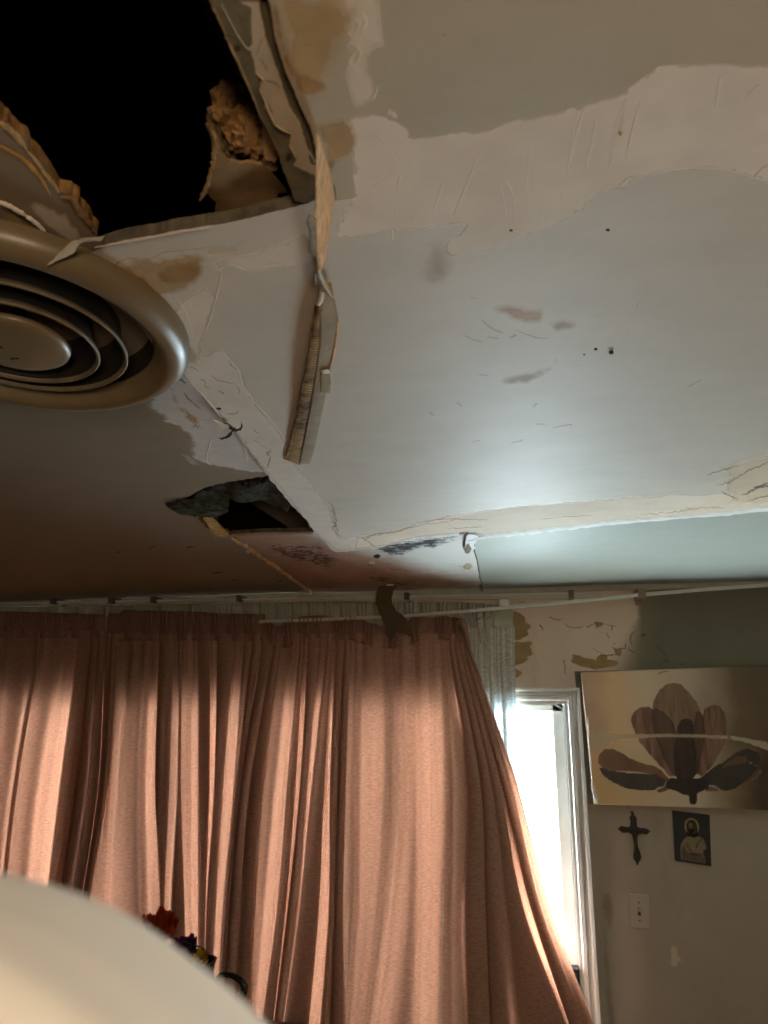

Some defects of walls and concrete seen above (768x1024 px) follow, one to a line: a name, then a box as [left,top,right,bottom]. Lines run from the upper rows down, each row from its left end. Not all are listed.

leakage [276,2,345,93]
peeling [221,2,315,175]
leakage [116,248,201,294]
crack [179,367,271,468]
leakage [360,518,484,555]
peeling [513,611,535,678]
peeling [571,648,622,670]